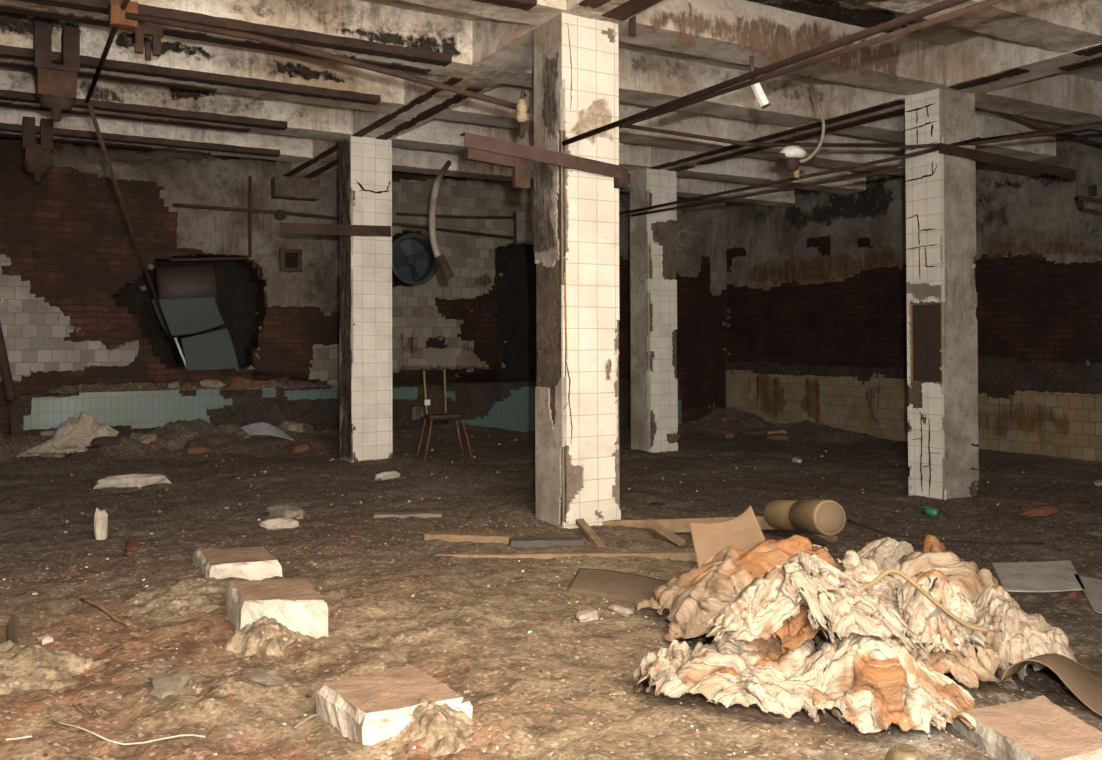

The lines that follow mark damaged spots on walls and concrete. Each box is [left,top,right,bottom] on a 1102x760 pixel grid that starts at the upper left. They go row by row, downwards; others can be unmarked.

water stain [0,11,81,35]
water stain [115,32,211,61]
water stain [648,0,899,81]
spalling [0,166,339,399]
spalling [536,166,573,431]
spalling [646,189,946,433]
spalling [972,252,1102,399]
spalling [649,409,677,452]
spalling [558,444,584,525]